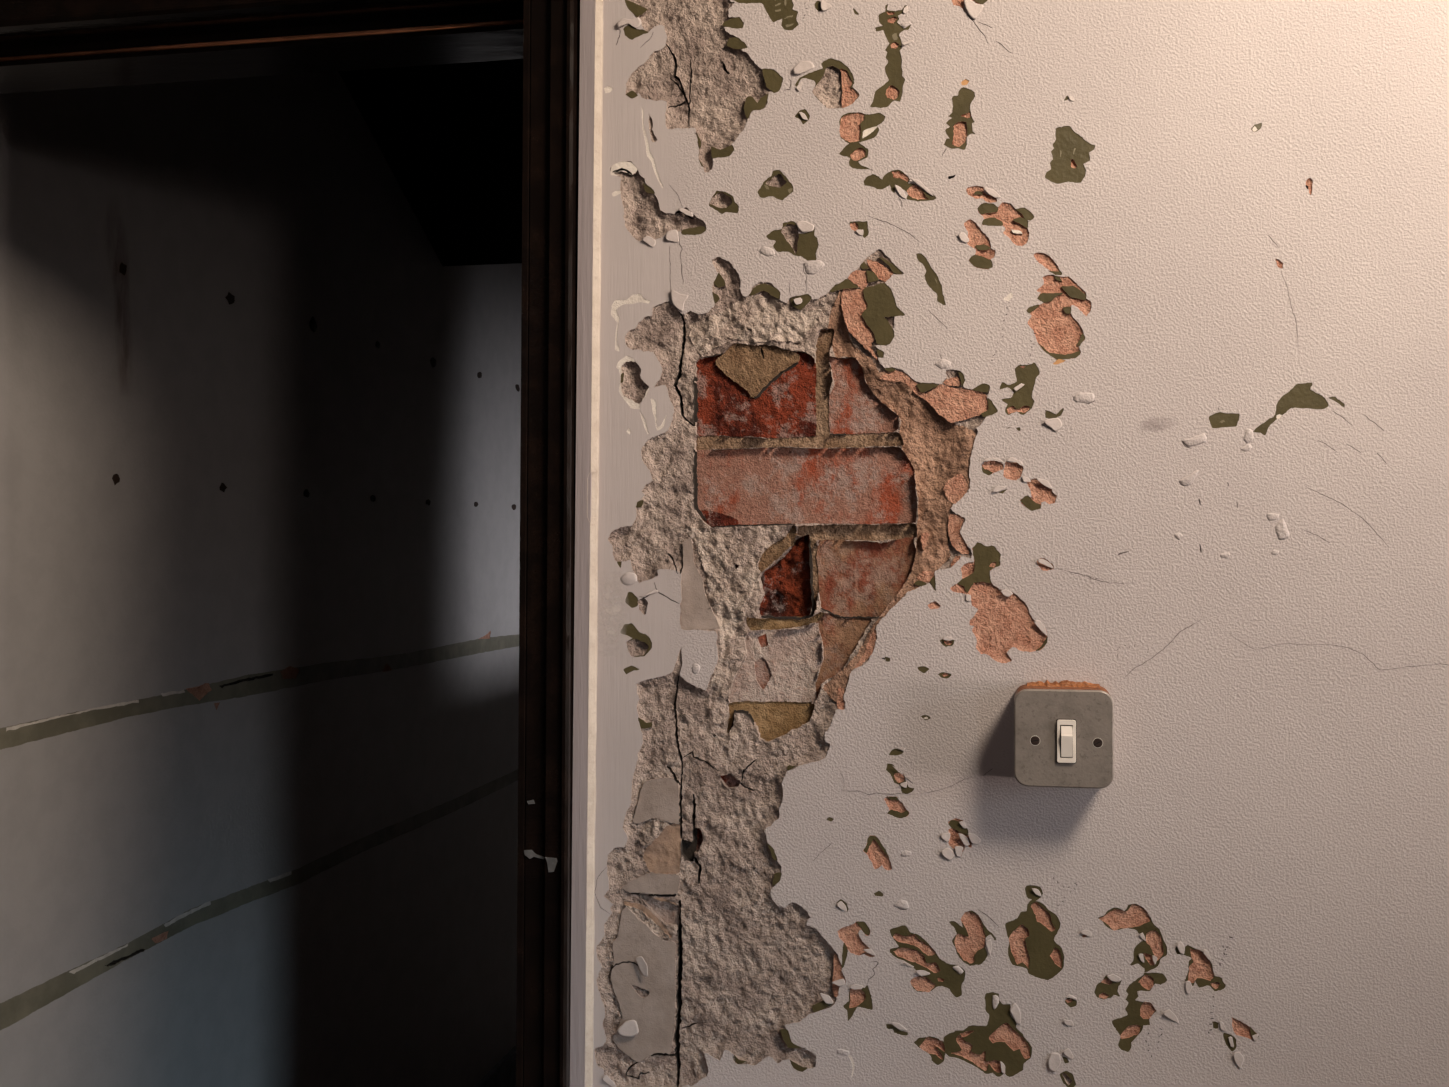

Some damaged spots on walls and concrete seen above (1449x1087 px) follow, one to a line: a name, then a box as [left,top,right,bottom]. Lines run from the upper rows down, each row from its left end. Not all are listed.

peeling [952,0,987,19]
spalling [604,0,936,205]
peeling [942,79,975,156]
peeling [1045,126,1095,184]
spalling [610,161,739,247]
peeling [1209,408,1240,428]
peeling [1253,383,1345,435]
spalling [594,186,1092,1087]
peeling [1080,904,1226,1052]
peeling [1212,1018,1259,1069]